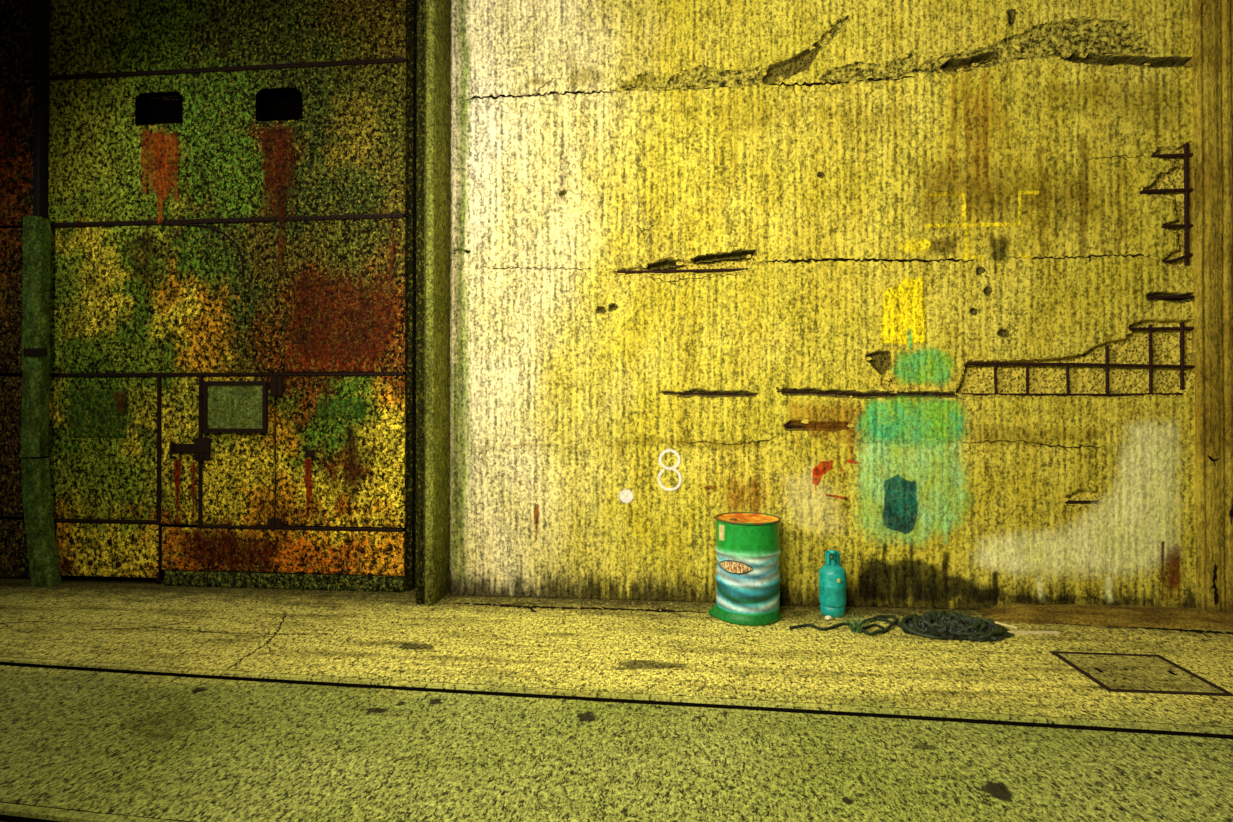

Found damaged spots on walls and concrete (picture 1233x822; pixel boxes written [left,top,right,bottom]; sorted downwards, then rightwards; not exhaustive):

spalling [615,9,1192,91]
corrosion [142,131,178,223]
spalling [1137,140,1194,270]
spalling [603,248,757,275]
spalling [1146,291,1195,303]
spalling [776,318,1196,399]
corrosion [174,460,195,523]